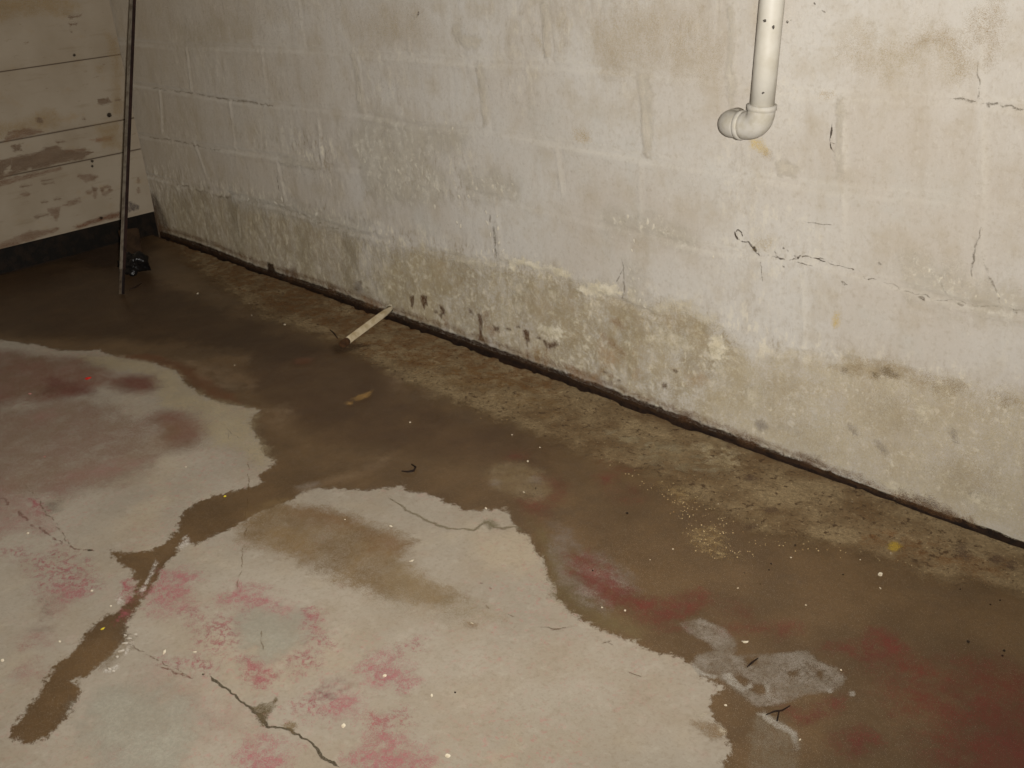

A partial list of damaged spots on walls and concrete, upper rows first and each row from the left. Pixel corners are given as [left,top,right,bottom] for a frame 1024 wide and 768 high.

crack [953,64,1024,111]
peeling [0,140,93,197]
peeling [0,173,98,249]
crack [734,229,1019,314]
water stain [0,181,1024,768]
crack [1,485,93,551]
crack [390,498,521,531]
crack [119,636,339,767]